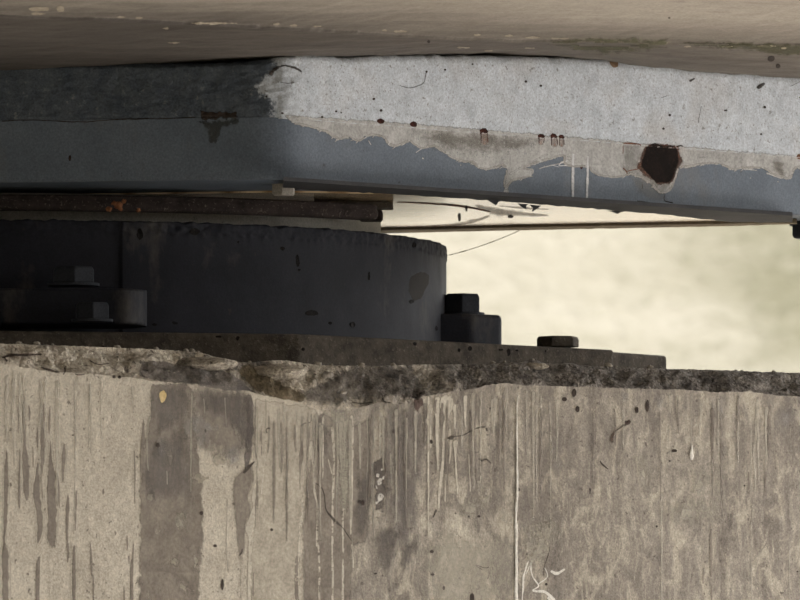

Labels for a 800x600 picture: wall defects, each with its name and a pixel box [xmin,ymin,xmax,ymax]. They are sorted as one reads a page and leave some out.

leakage [123,364,306,600]
spalling [300,366,436,412]